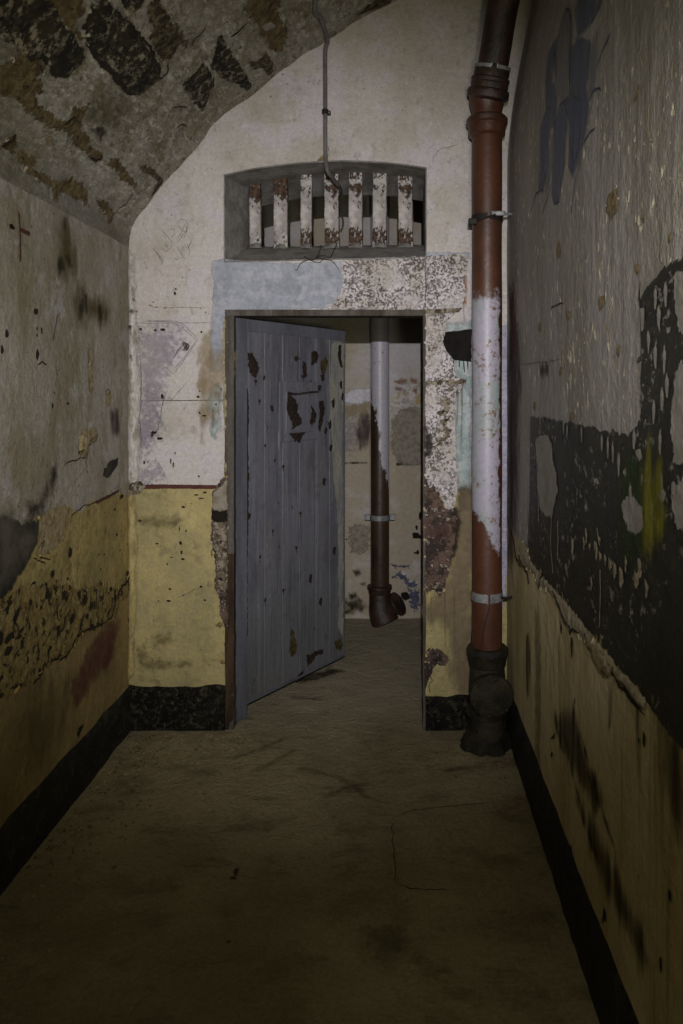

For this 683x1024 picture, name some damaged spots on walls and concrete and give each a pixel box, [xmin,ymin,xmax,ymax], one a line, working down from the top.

flaking render [0,553,130,698]
flaking render [194,444,229,628]
flaking render [325,252,470,597]
peeling [523,257,683,748]